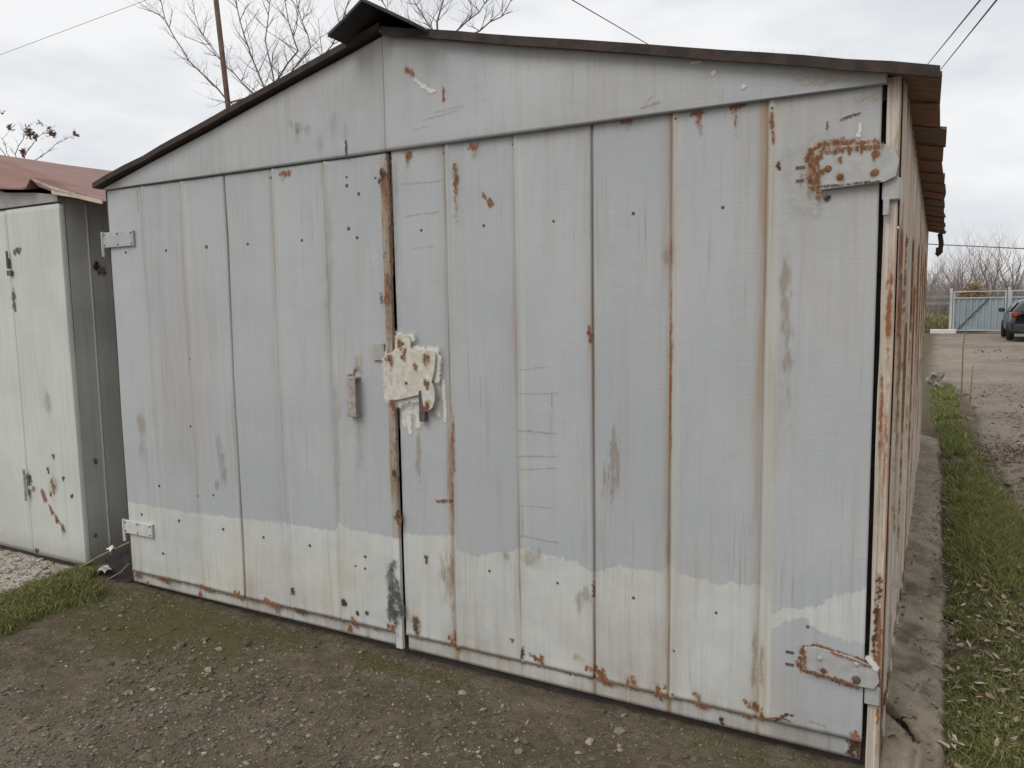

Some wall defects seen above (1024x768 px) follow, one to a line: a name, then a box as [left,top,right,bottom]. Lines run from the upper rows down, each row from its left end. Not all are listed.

rust [804,112,883,202]
rust [378,157,394,305]
peeling [382,350,422,435]
peeling [395,331,447,423]
rust [878,227,927,494]
rust [41,455,65,533]
rust [413,617,681,702]
rust [796,552,907,751]
rust [692,692,794,725]
rust [846,730,860,758]